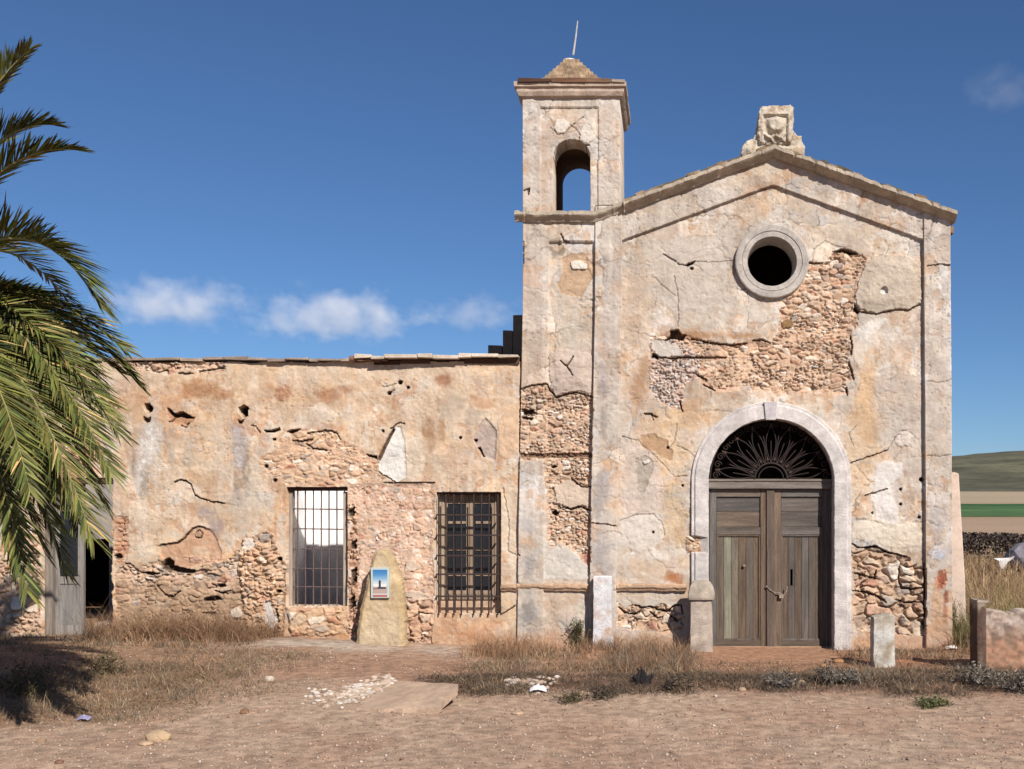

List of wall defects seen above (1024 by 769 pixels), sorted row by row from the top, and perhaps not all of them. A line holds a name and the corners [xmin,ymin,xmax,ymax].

crack [653,255,734,327]
spalling [648,249,870,412]
spalling [168,410,195,428]
crack [179,480,225,504]
spalling [474,384,595,575]
crack [848,425,900,464]
spalling [114,423,436,644]
spalling [617,602,685,635]
spalling [851,543,949,638]